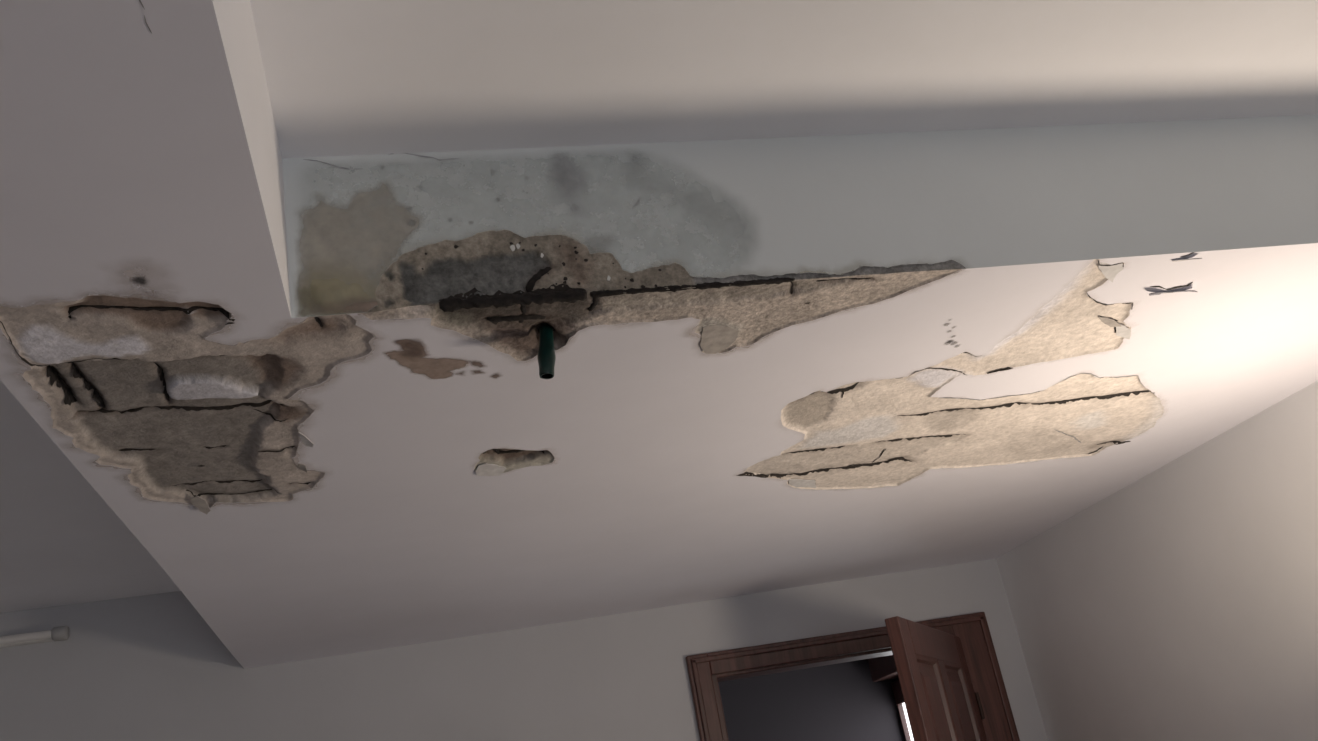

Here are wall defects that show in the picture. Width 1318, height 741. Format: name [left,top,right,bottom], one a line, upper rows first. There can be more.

damp [298,184,419,315]
spalling [0,230,966,515]
flaking render [736,259,1164,490]